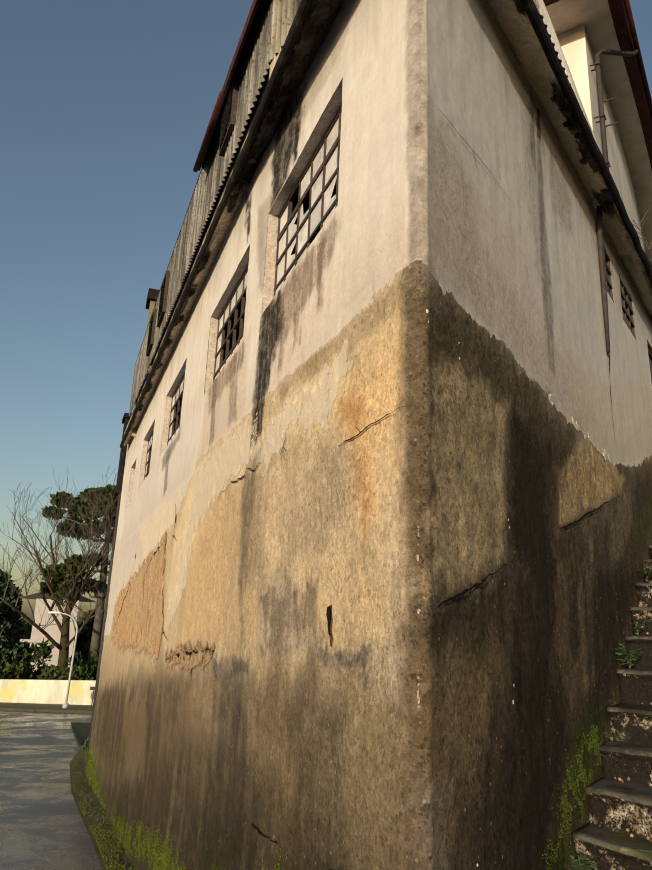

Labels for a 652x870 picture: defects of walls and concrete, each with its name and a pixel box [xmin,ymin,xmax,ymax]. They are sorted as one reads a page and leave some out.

damp [270,83,306,208]
spalling [550,82,600,173]
damp [250,223,335,445]
crack [339,406,404,446]
flaking render [111,339,353,679]
crack [560,496,620,530]
crack [438,564,507,608]